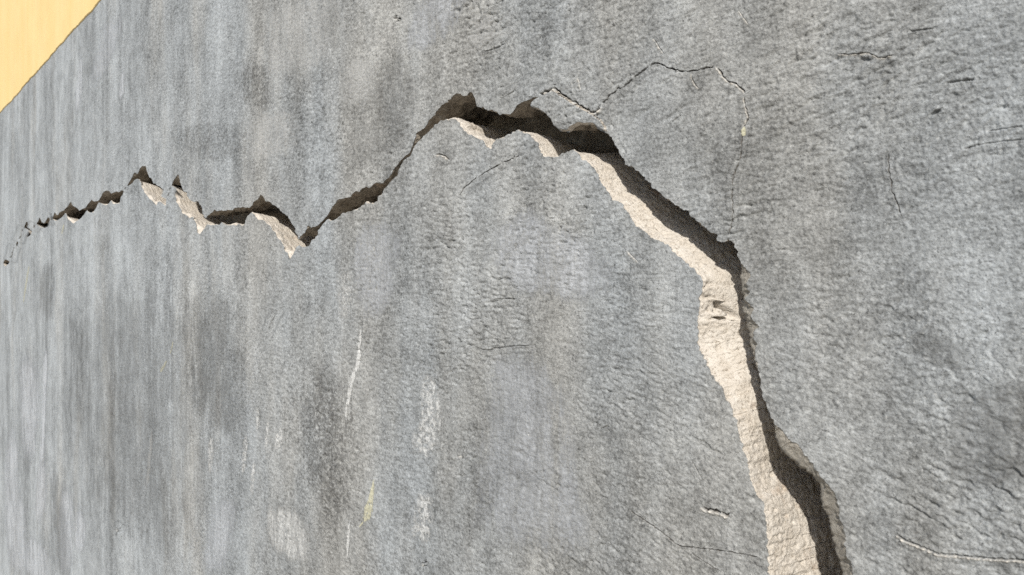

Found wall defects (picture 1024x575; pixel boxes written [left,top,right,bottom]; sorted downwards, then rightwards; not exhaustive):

crack [3,57,853,575]